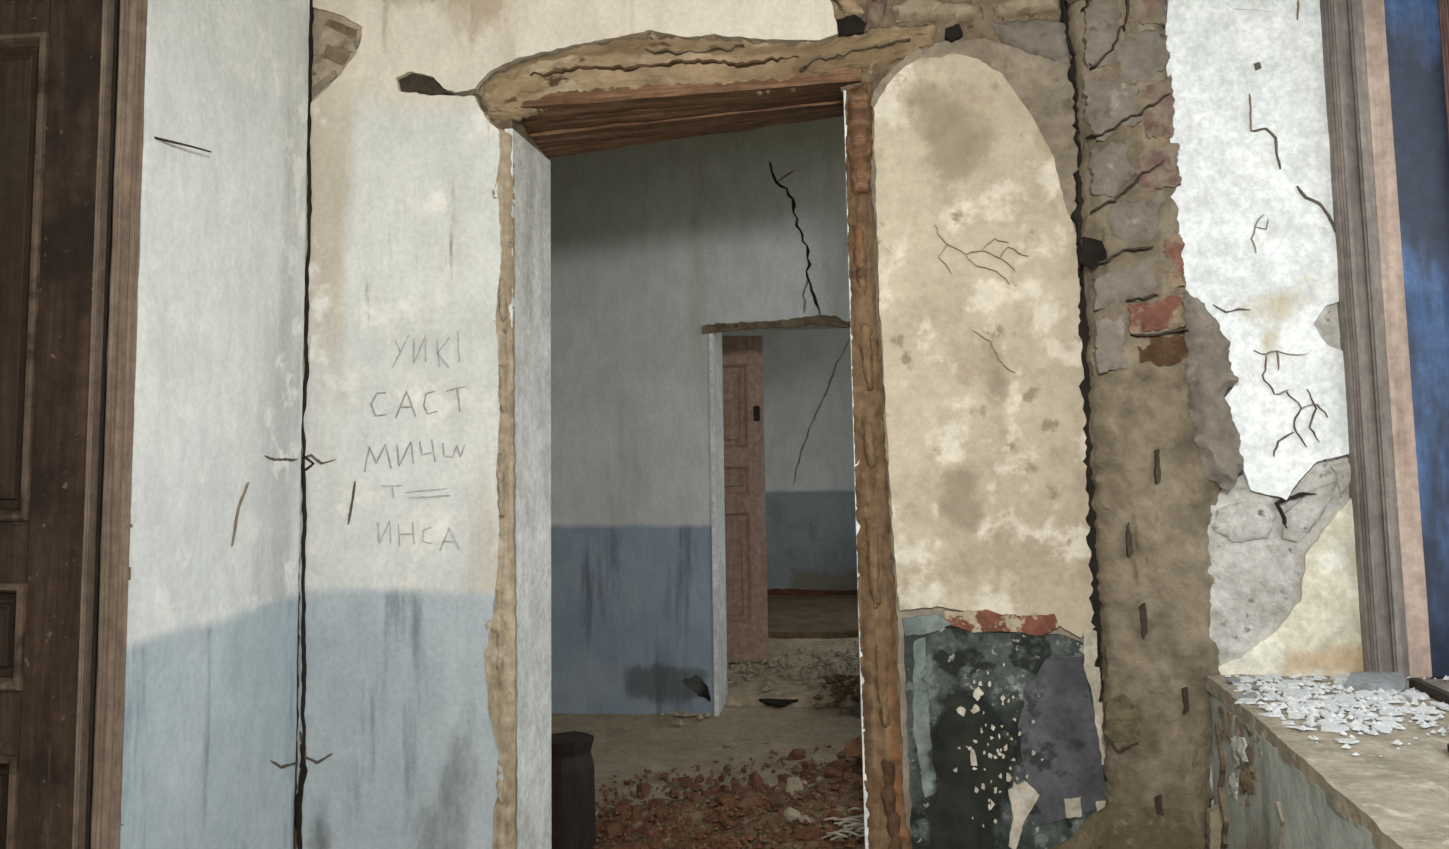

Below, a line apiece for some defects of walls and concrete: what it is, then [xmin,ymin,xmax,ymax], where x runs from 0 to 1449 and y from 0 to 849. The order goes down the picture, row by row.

crack [769,161,821,315]
crack [935,226,1027,284]
flaking render [833,0,1189,381]
crack [1250,215,1269,253]
crack [1249,93,1336,233]
flaking render [1314,303,1341,350]
crack [265,0,336,849]
crack [793,339,851,485]
crack [1253,350,1329,456]
flaking render [1207,458,1351,664]
peeling [902,609,1106,849]
flaking render [1206,706,1263,849]